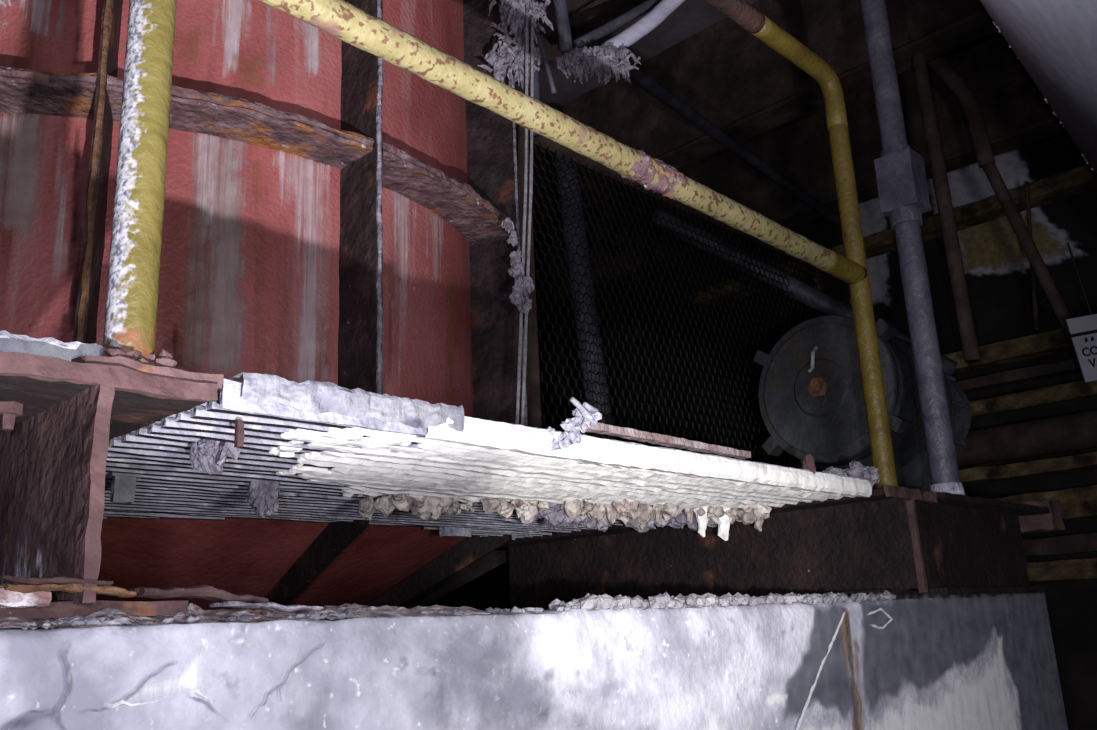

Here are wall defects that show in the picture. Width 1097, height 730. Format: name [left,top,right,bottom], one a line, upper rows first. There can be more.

corrosion [72,261,81,325]
leakage [185,134,872,541]
crack [113,699,145,707]
leakage [765,605,852,730]
leakage [863,593,1068,730]